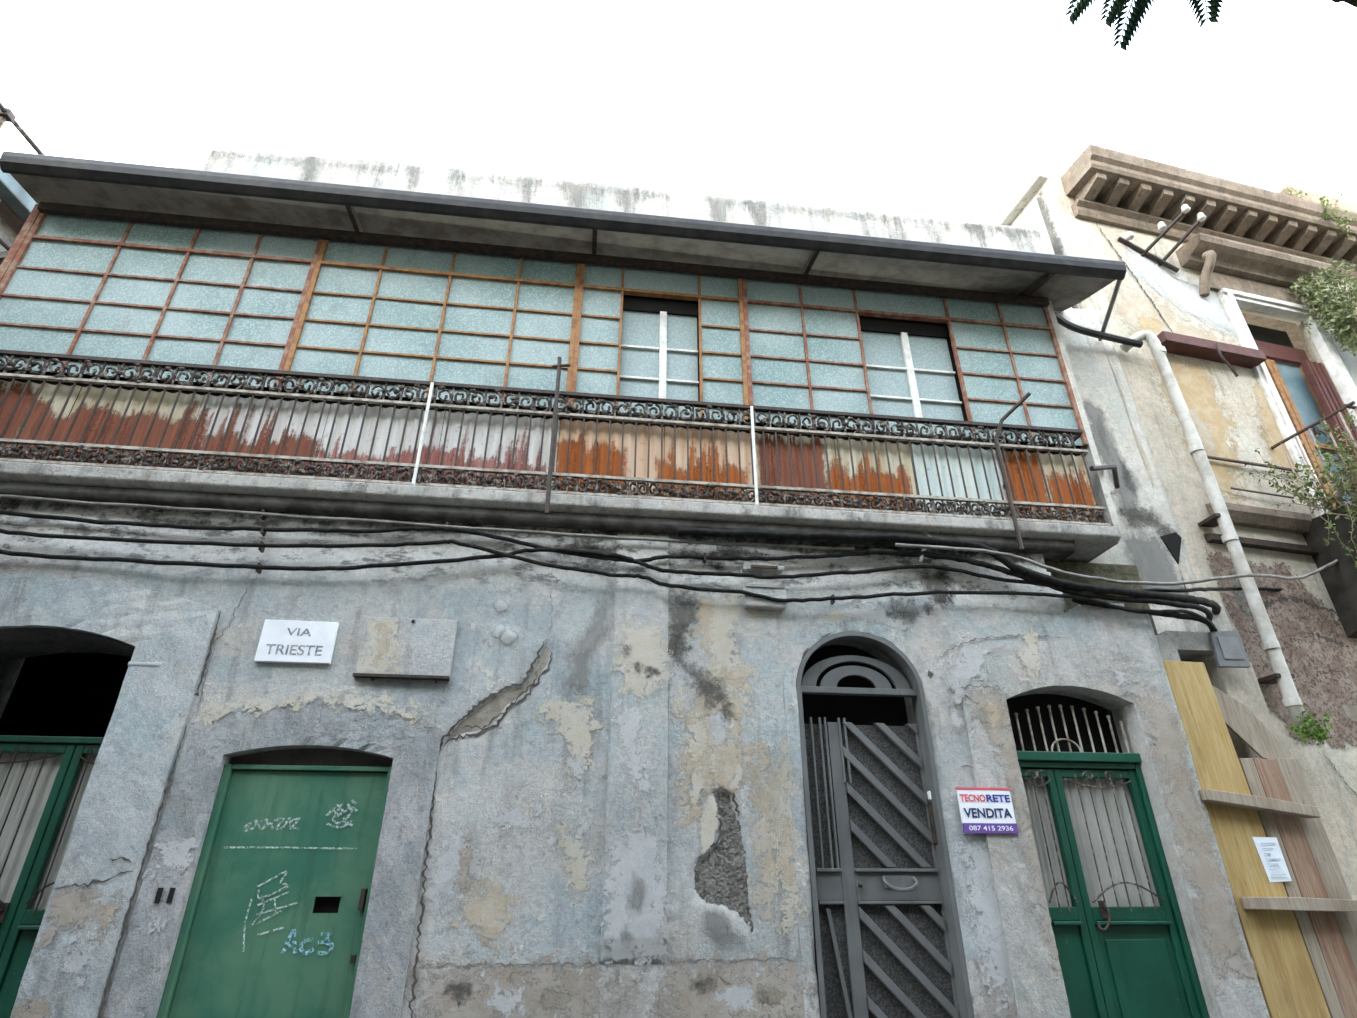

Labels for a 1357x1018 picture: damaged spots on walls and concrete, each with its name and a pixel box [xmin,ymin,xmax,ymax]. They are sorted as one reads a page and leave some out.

rust [0,380,627,495]
rust [655,434,916,512]
rust [996,450,1099,523]
peeling [196,616,441,732]
water stain [668,592,733,719]
crack [408,592,600,1018]
peeling [403,587,815,1018]